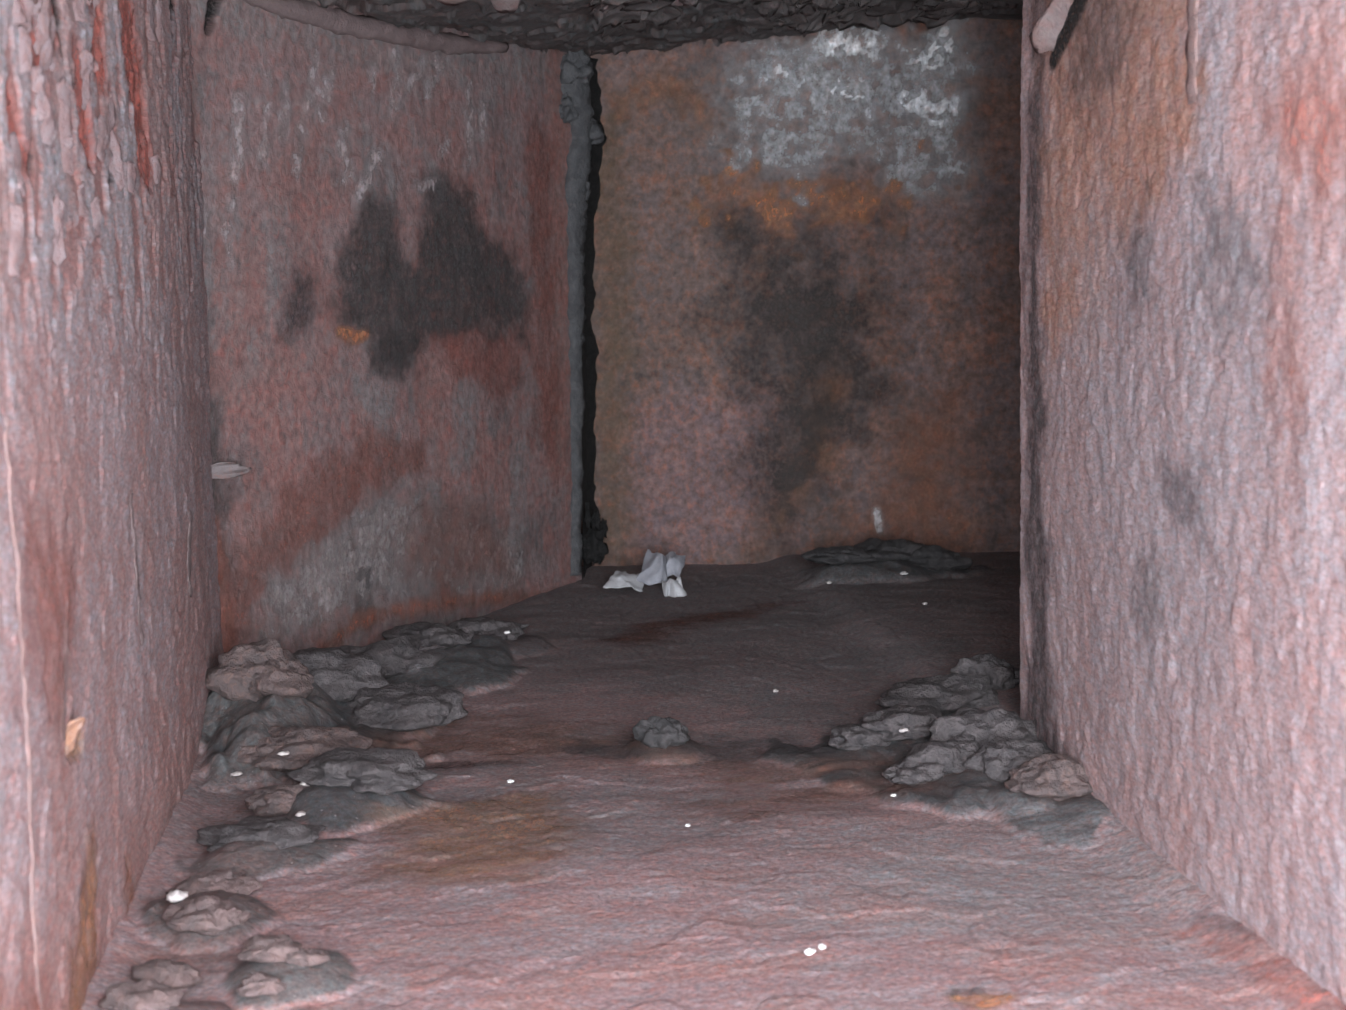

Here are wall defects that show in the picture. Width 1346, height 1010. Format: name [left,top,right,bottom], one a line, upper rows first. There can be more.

peeling [491,0,519,13]
peeling [588,0,699,39]
peeling [715,0,983,34]
peeling [1029,0,1087,70]
peeling [8,132,27,278]
peeling [12,0,161,266]
water stain [221,49,335,262]
water stain [337,127,383,200]
water stain [729,28,977,197]
crack [559,49,609,577]
water stain [1025,55,1057,754]
water stain [874,510,882,533]